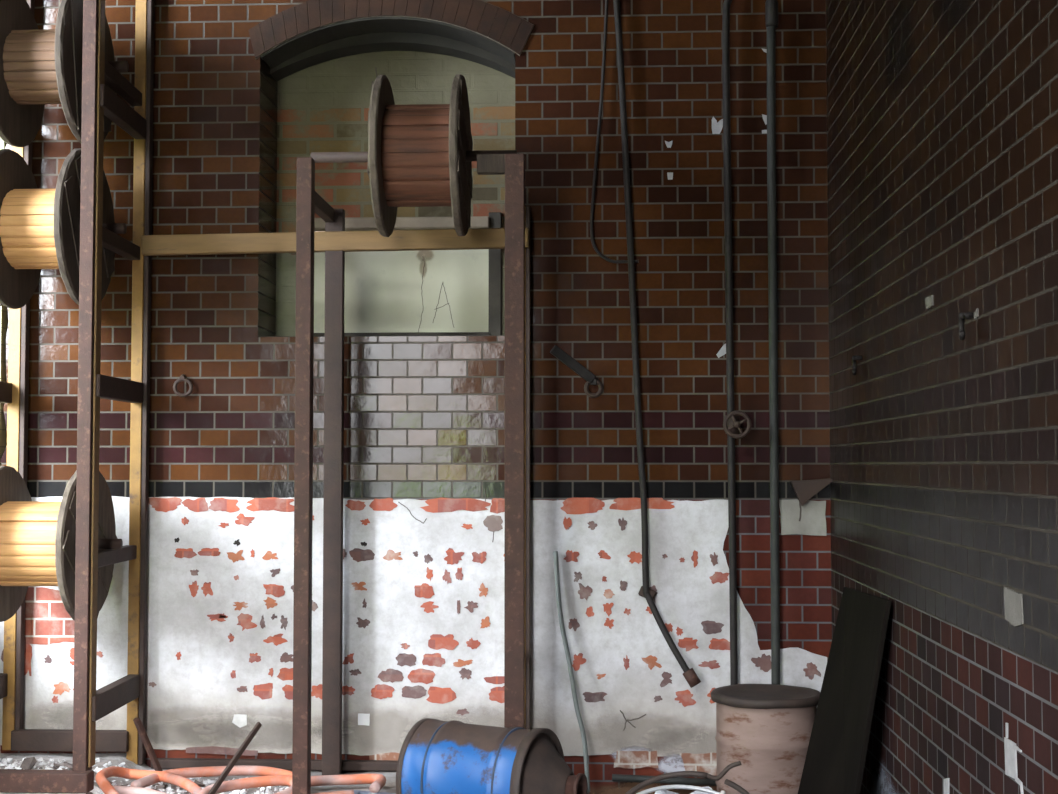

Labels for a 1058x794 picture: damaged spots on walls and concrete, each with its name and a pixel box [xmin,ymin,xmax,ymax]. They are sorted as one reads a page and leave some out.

peeling [149,497,294,528]
peeling [420,497,505,532]
peeling [561,498,675,531]
peeling [24,587,75,676]
peeling [174,538,294,700]
peeling [343,542,487,613]
peeling [371,634,481,715]
peeling [457,583,491,628]
peeling [564,550,631,631]
peeling [642,655,715,707]
peeling [665,620,730,669]
peeling [1004,723,1024,794]